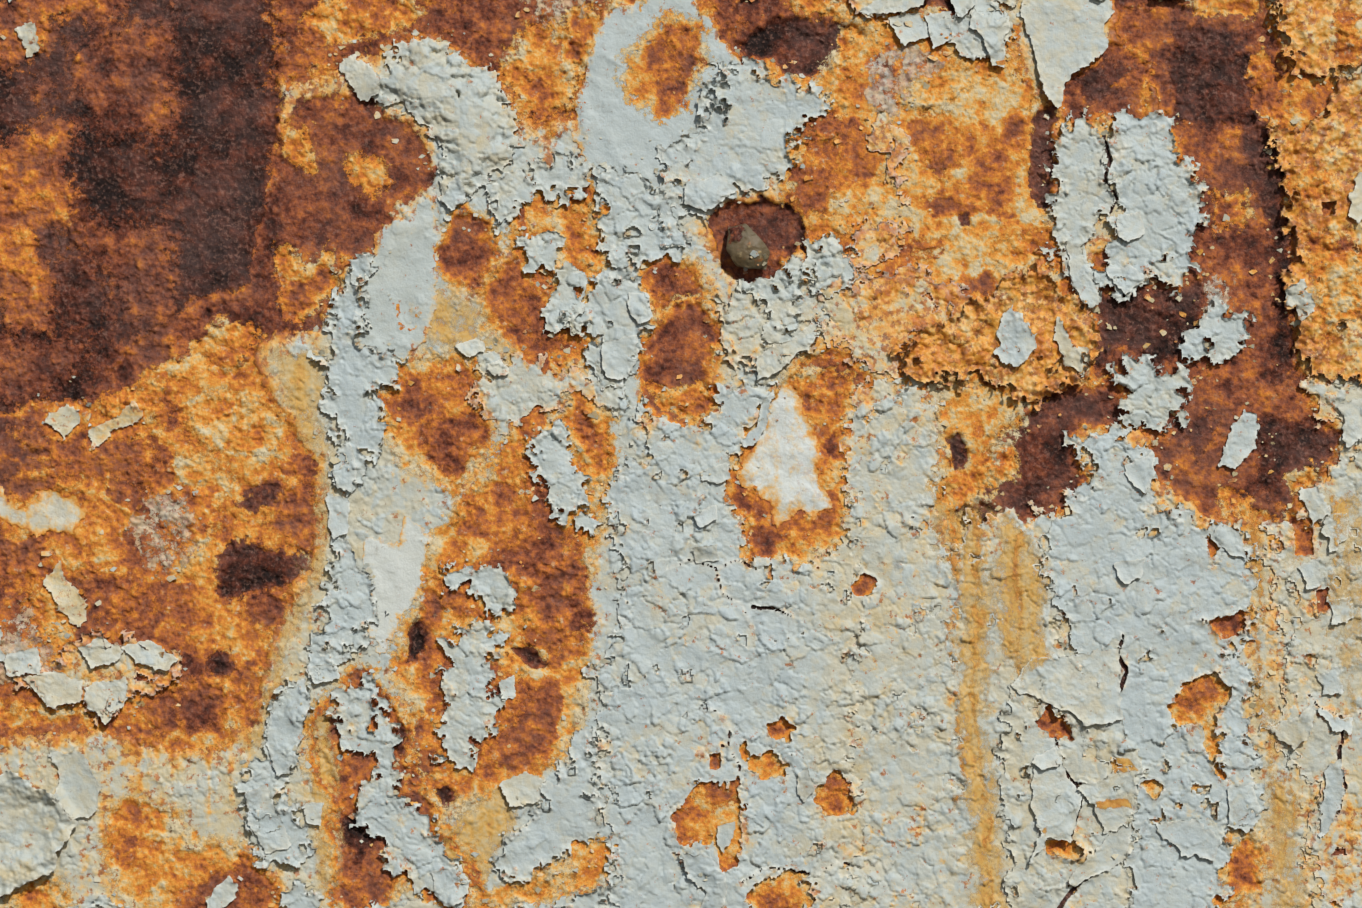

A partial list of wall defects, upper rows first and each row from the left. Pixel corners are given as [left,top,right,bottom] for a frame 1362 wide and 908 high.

rust [3,868,74,908]
peeling [0,750,102,897]
peeling [0,560,182,726]
rust [96,793,287,908]
rust [0,0,647,758]
peeling [235,194,518,908]
rust [300,174,626,908]
peeling [455,0,1362,908]
rust [612,0,1347,908]
rust [1316,495,1362,717]